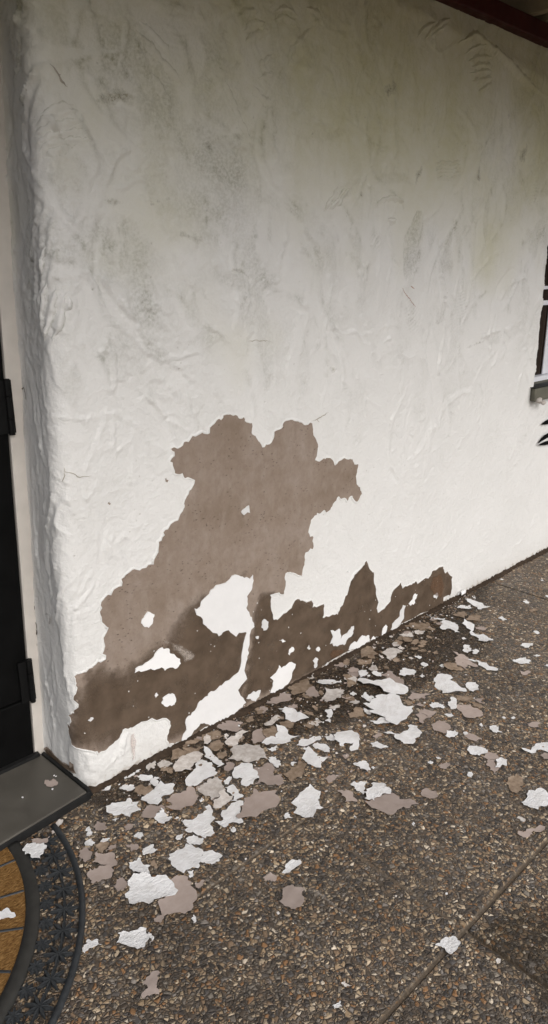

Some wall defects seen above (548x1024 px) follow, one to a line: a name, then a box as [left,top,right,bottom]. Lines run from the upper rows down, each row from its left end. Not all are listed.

peeling [67,413,493,755]